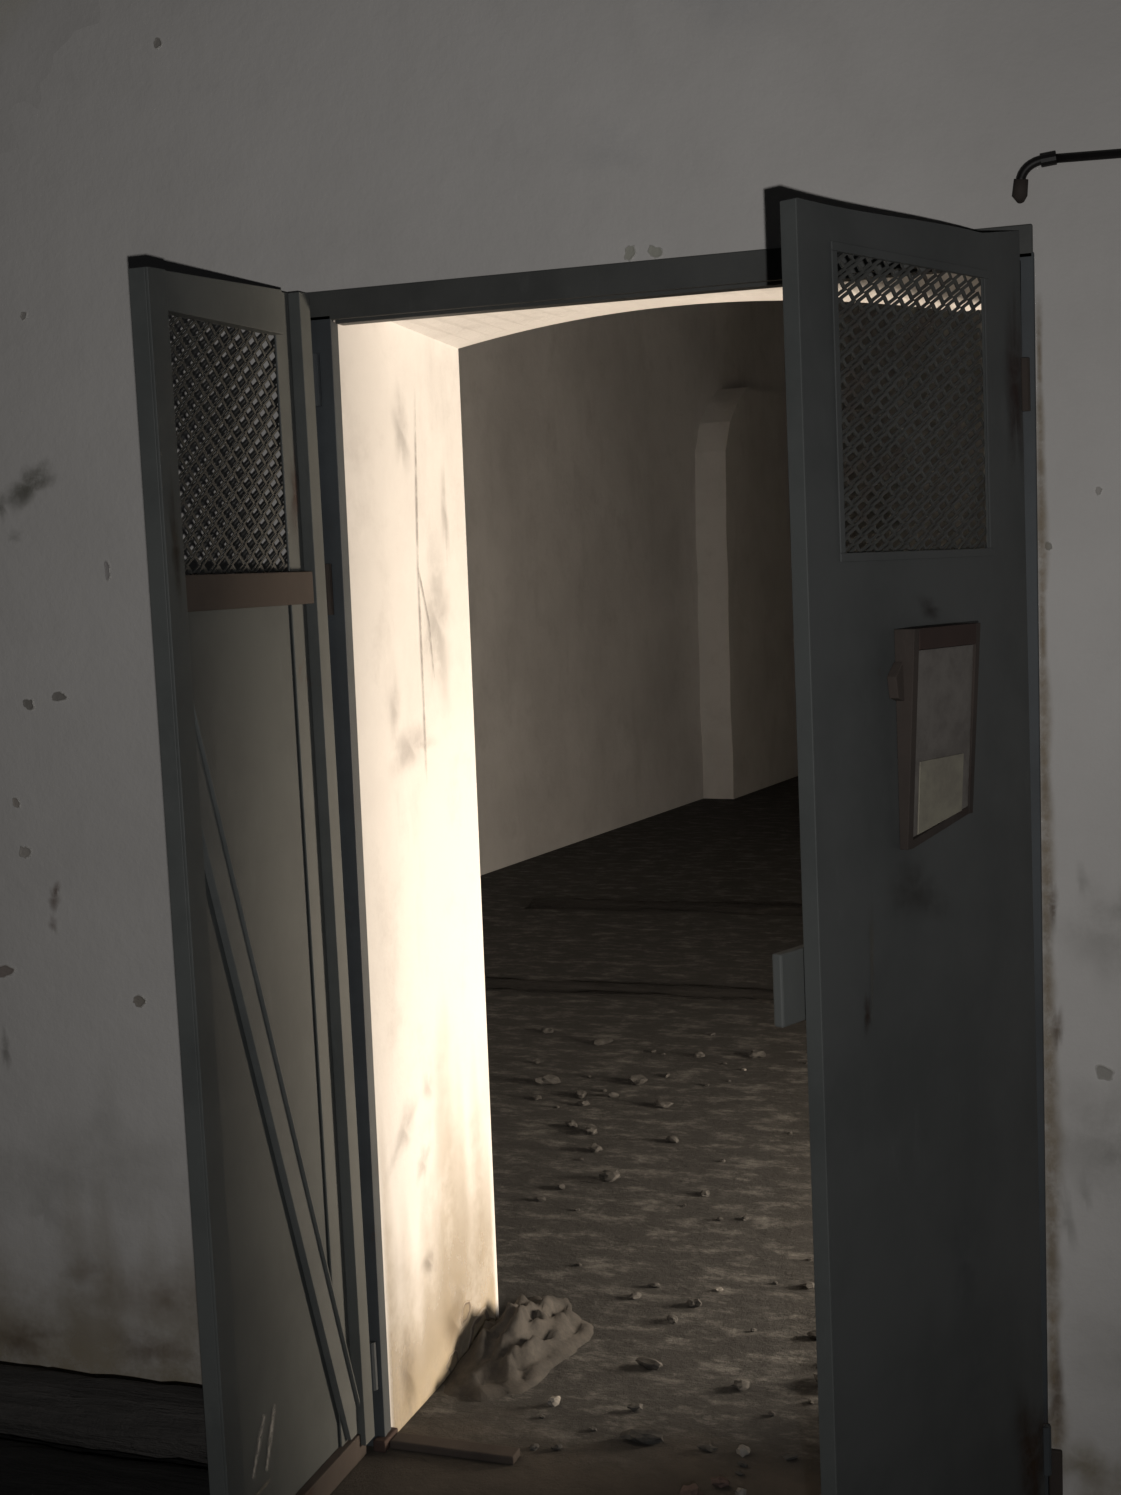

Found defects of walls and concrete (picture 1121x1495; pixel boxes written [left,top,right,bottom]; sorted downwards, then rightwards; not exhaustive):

damp [0,1316,192,1387]
damp [391,1229,496,1432]